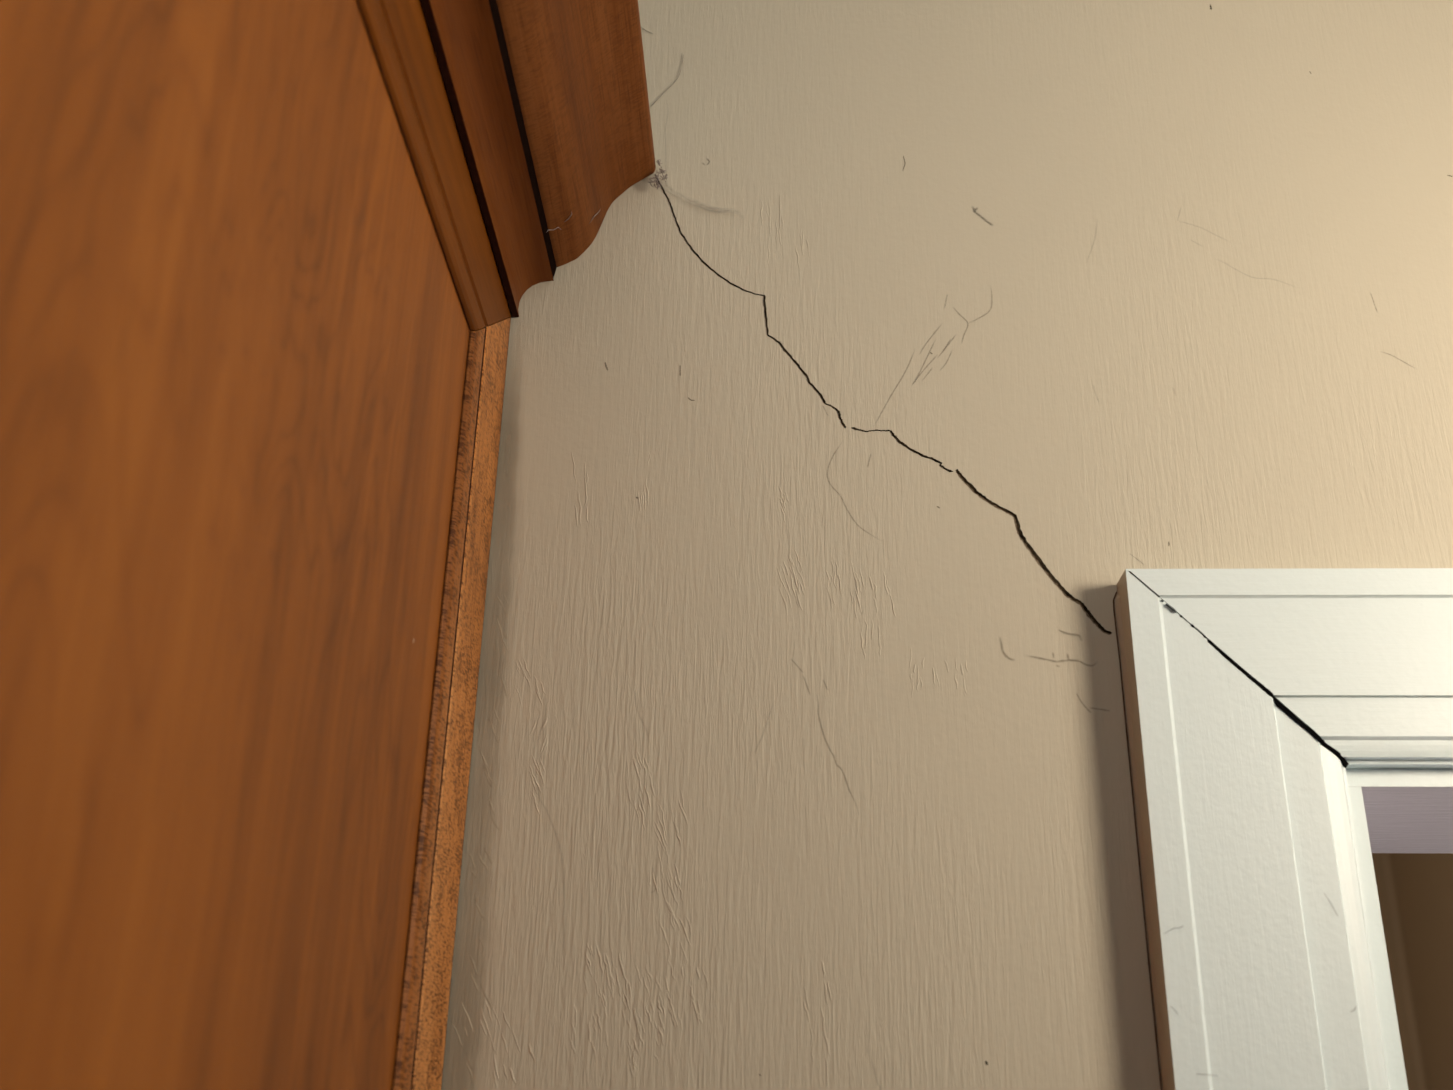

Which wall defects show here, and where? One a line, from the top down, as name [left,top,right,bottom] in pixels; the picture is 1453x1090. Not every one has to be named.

crack [656,175,1112,635]